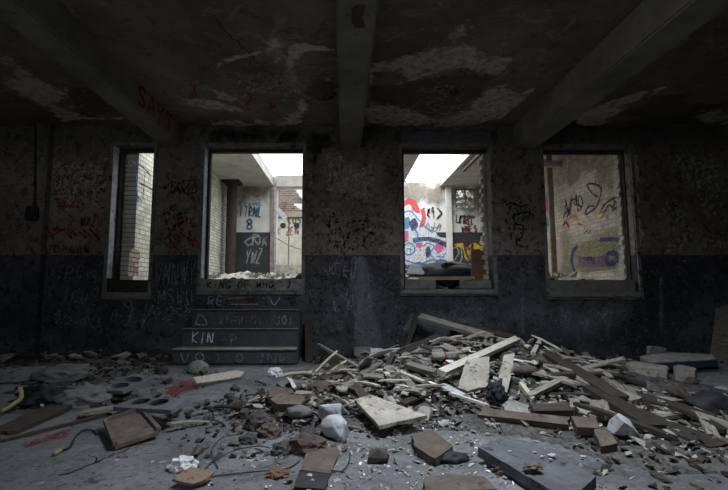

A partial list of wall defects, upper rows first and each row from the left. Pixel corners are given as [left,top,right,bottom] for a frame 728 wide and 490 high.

peeling [369,19,513,89]
peeling [0,56,125,122]
peeling [365,83,535,127]